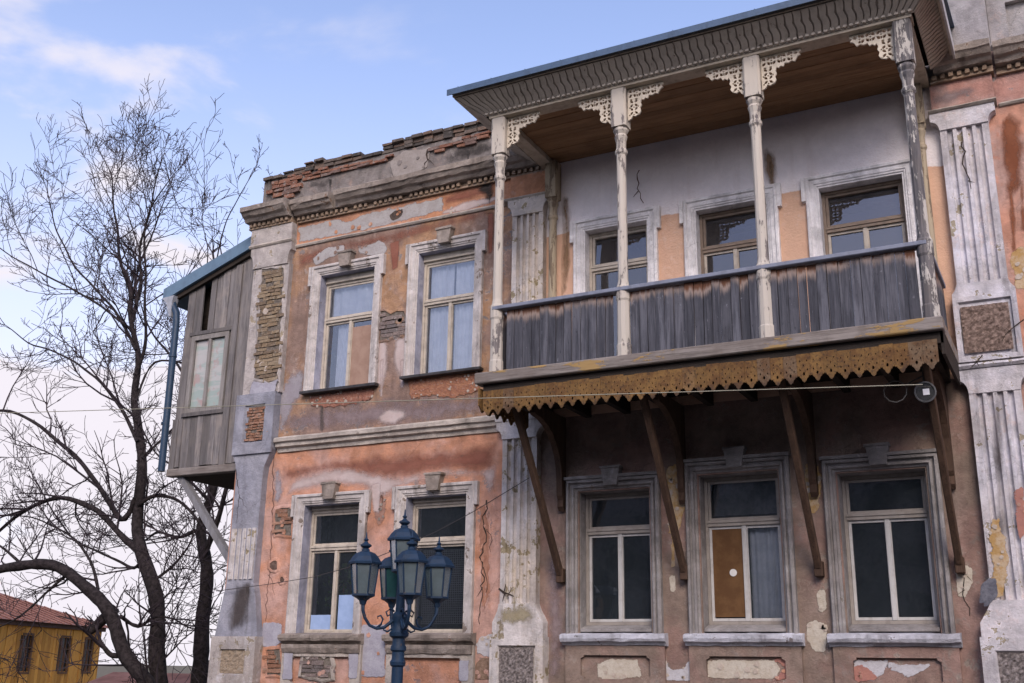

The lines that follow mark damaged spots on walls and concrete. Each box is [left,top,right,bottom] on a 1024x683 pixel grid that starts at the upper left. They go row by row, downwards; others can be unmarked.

flaking render [266,130,492,200]
crack [960,142,975,187]
flaking render [253,264,286,384]
flaking render [379,308,406,344]
flaking render [244,406,268,441]
flaking render [272,504,293,539]
crack [477,500,514,624]
peeling [956,487,1024,607]
peeling [806,590,828,652]
peeling [597,658,641,679]
peeling [707,658,786,681]
peeling [853,660,930,682]